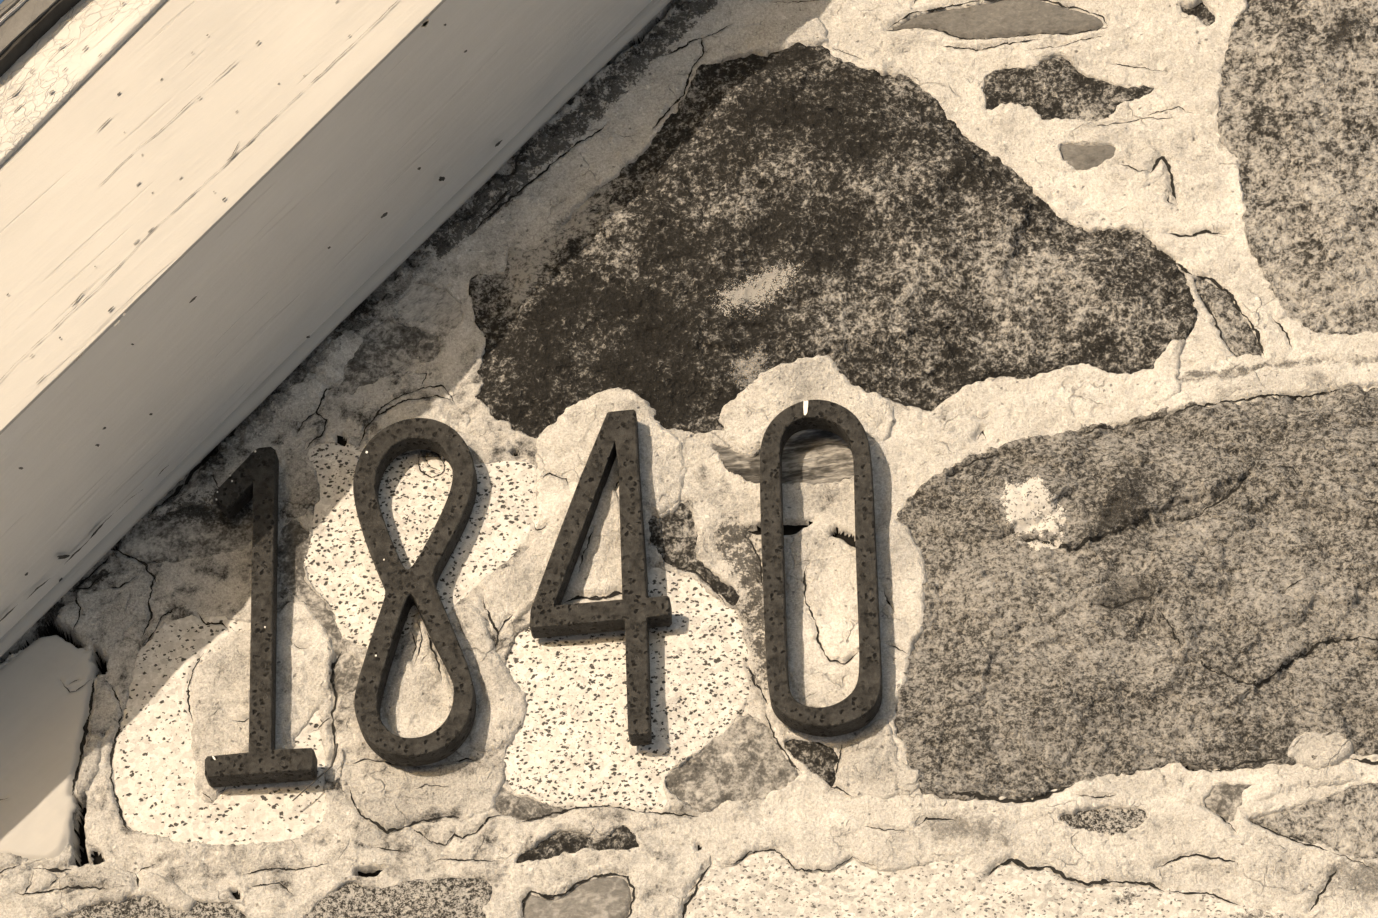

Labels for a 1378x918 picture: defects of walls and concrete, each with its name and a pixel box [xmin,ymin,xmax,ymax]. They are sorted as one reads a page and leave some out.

crack [0,0,398,380]
crack [64,679,129,830]
crack [0,864,156,895]
crack [989,806,1374,910]